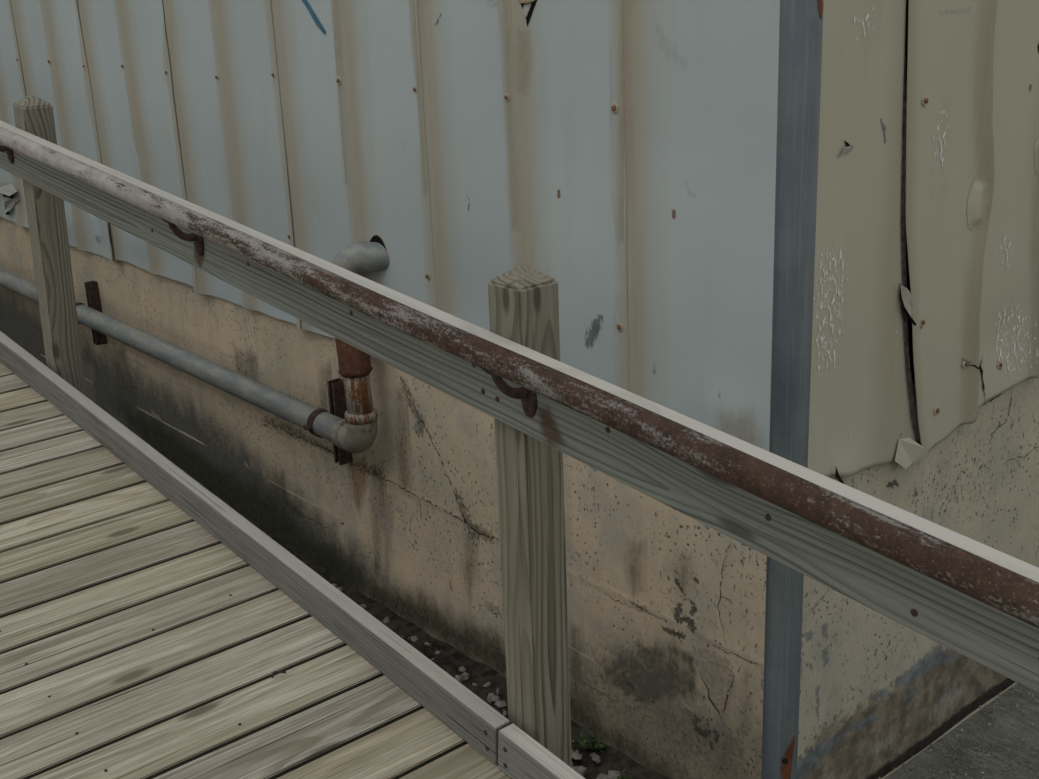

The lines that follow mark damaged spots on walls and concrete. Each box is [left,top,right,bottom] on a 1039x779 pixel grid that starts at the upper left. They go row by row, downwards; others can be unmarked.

damp [0,295,47,366]
damp [81,342,365,582]
crack [259,381,499,540]
rust [540,412,560,442]
crack [712,543,757,664]
damp [572,646,746,779]
rust [781,736,795,779]